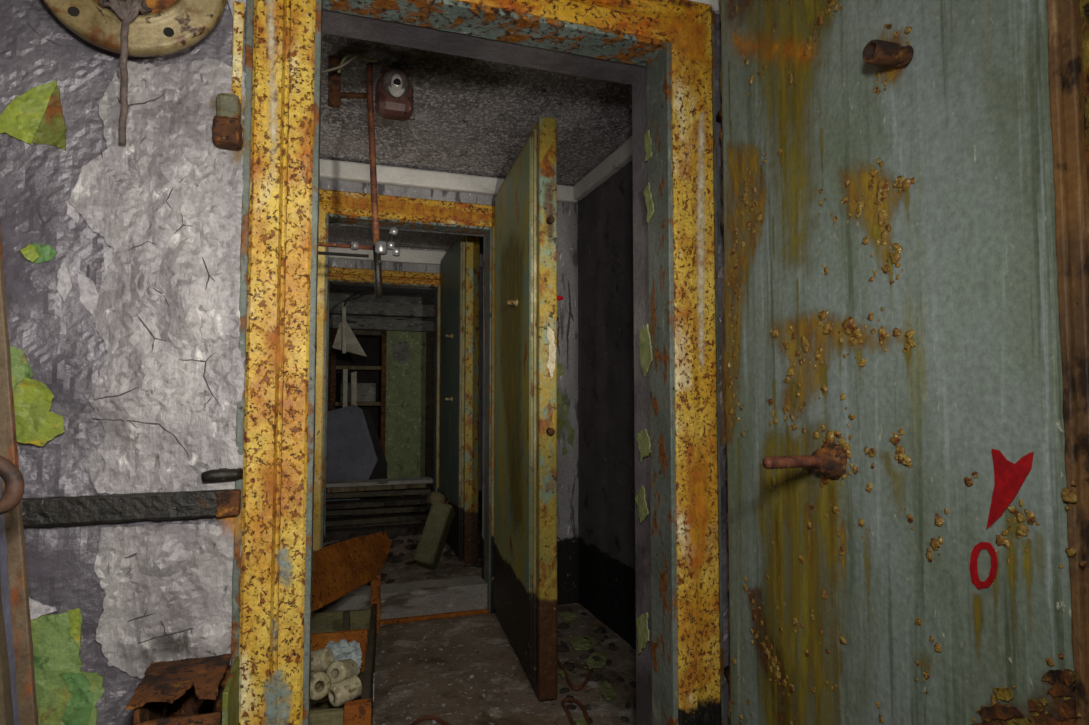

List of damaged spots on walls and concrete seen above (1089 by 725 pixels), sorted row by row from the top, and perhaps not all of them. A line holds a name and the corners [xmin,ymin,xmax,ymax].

corrosion [722,0,915,480]
peeling [10,346,65,446]
corrosion [730,279,916,725]
corrosion [926,508,949,563]
corrosion [964,471,978,487]
corrosion [990,499,1040,608]
peeling [29,523,242,725]
corrosion [973,595,982,648]
corrosion [970,654,1082,725]